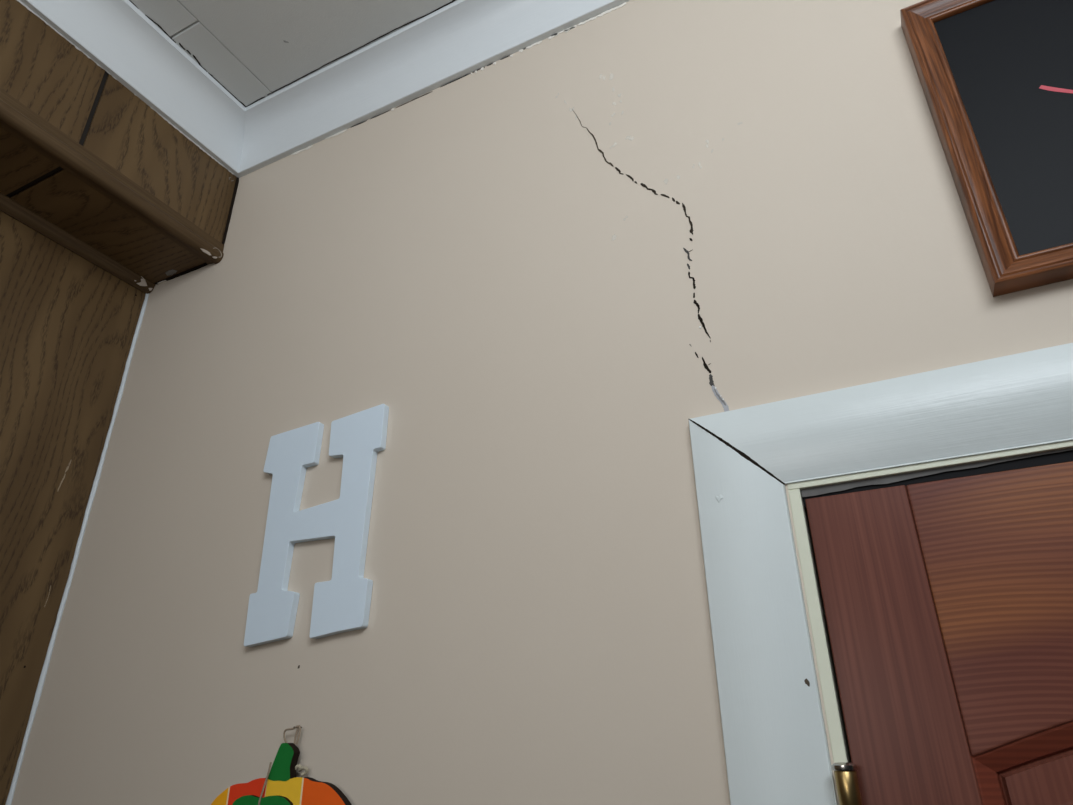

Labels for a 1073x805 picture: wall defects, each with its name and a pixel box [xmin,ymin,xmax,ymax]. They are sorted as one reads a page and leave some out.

crack [572,109,785,484]